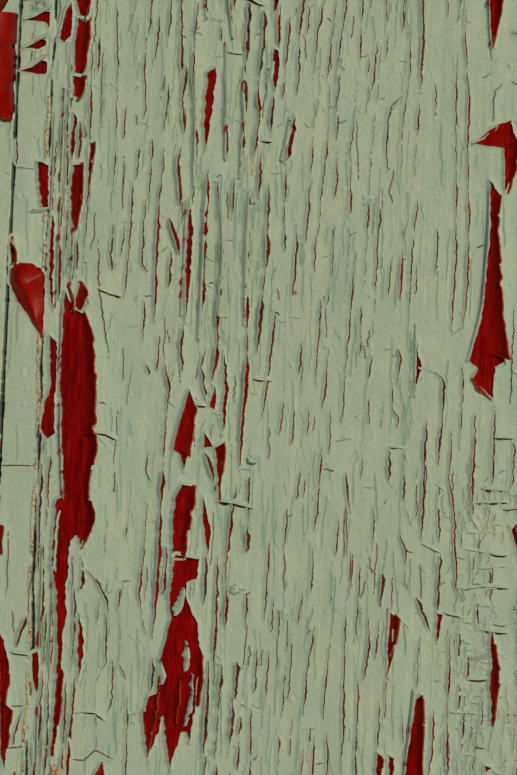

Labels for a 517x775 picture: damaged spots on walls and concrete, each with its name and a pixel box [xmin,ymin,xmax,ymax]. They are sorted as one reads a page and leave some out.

crack [11,138,19,166]
peeling [0,0,98,775]
peeling [170,351,231,503]
crack [48,0,437,775]
crack [383,0,517,775]
peeling [466,120,517,401]
peeling [486,0,504,60]
crack [2,439,129,775]
peeling [140,482,213,769]
peeling [384,608,401,682]
peeling [372,688,425,775]
peeling [468,627,501,726]